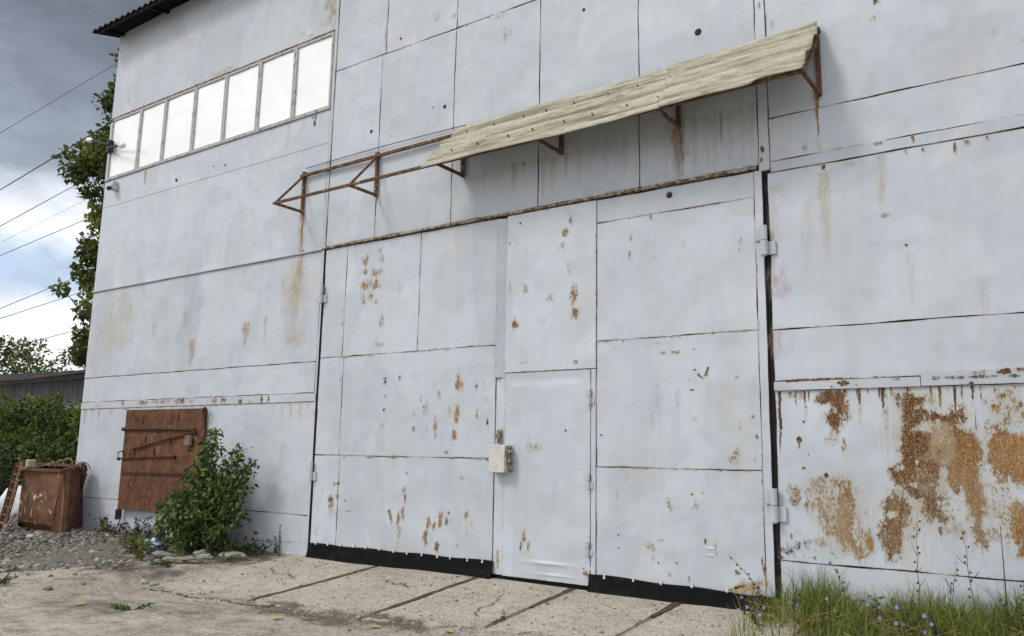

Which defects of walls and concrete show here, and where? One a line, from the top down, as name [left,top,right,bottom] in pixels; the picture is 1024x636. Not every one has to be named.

rust [360,247,385,304]
rust [567,264,578,319]
rust [122,397,241,410]
rust [778,367,1024,564]
rust [422,509,450,553]